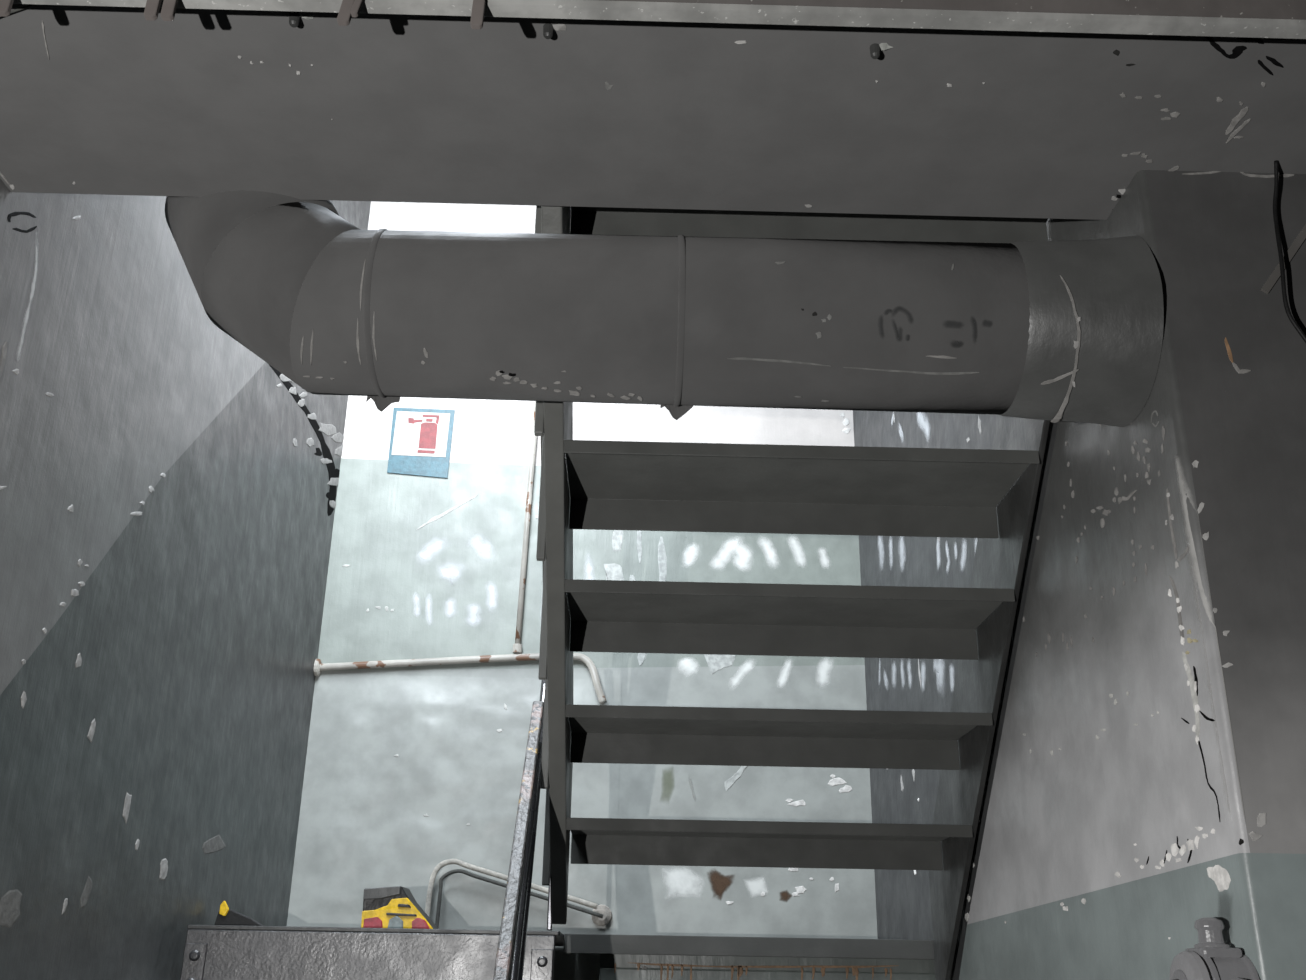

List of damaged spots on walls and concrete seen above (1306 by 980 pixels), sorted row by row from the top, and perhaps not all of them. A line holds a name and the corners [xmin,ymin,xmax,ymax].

peeling [0,248,37,378]
peeling [1075,410,1165,563]
crack [1165,489,1220,821]
spalling [725,766,747,791]
spalling [828,774,852,793]
flaking render [1133,826,1215,869]
spalling [788,868,813,897]
spalling [1207,865,1231,891]
corrosion [634,963,899,980]